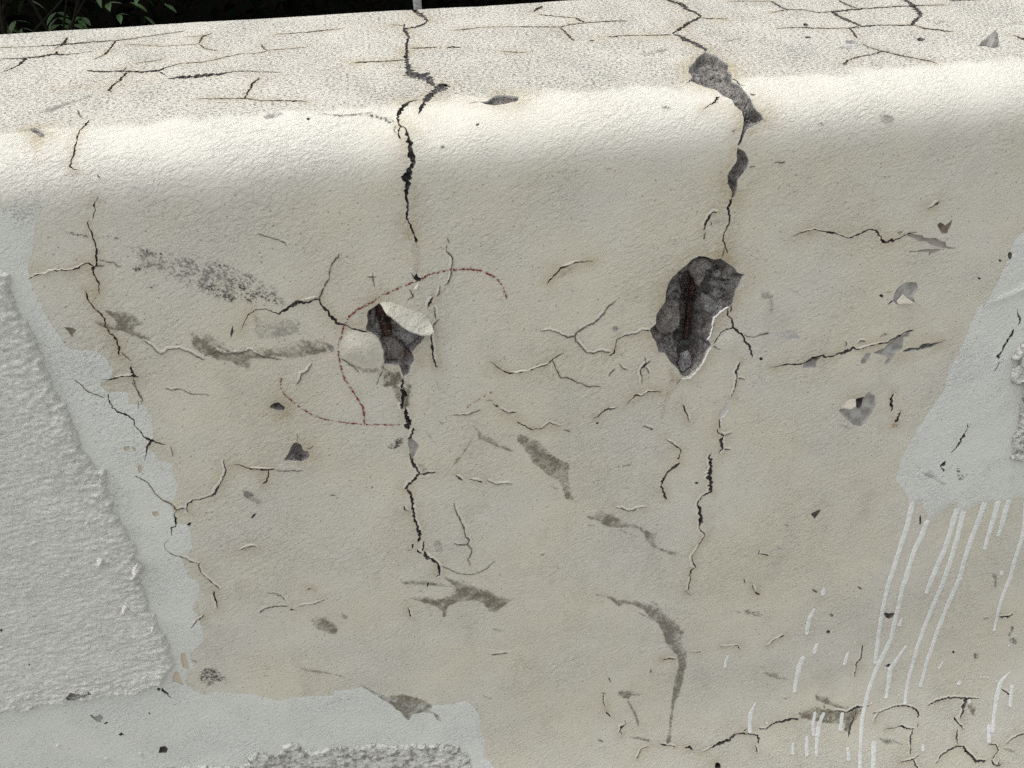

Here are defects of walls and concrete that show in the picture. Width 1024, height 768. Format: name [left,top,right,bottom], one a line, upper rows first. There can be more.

crack [0,29,369,116]
crack [355,0,973,243]
spalling [687,52,764,198]
crack [29,120,367,628]
spalling [366,273,434,385]
spalling [650,256,800,383]
peeling [839,392,875,426]
peeling [879,282,918,304]
peeling [861,332,945,365]
crack [685,362,746,596]
crack [602,693,799,759]
crack [824,688,1024,768]